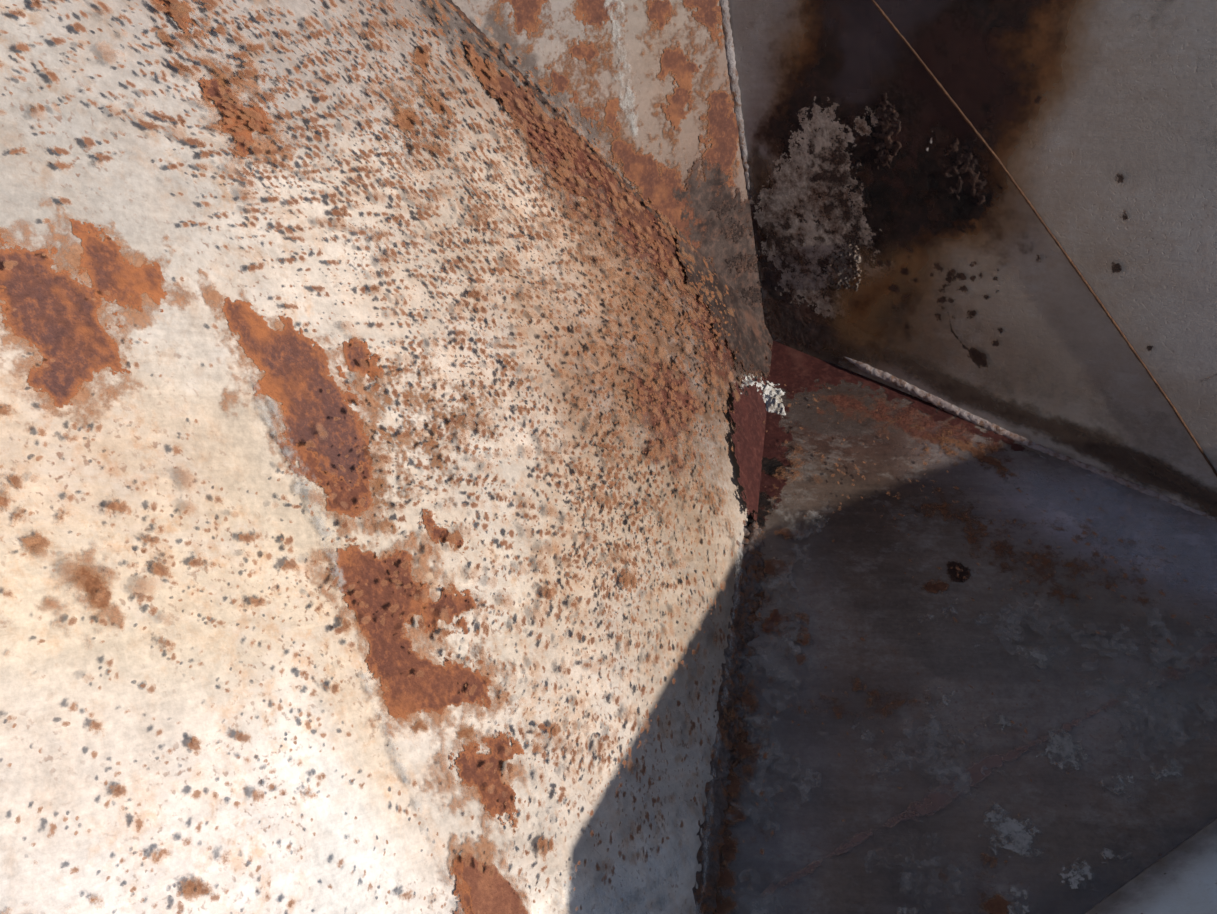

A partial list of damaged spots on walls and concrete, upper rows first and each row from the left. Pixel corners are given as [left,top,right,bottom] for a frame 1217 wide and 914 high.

rust [0,0,879,914]
leakage [854,347,1217,517]